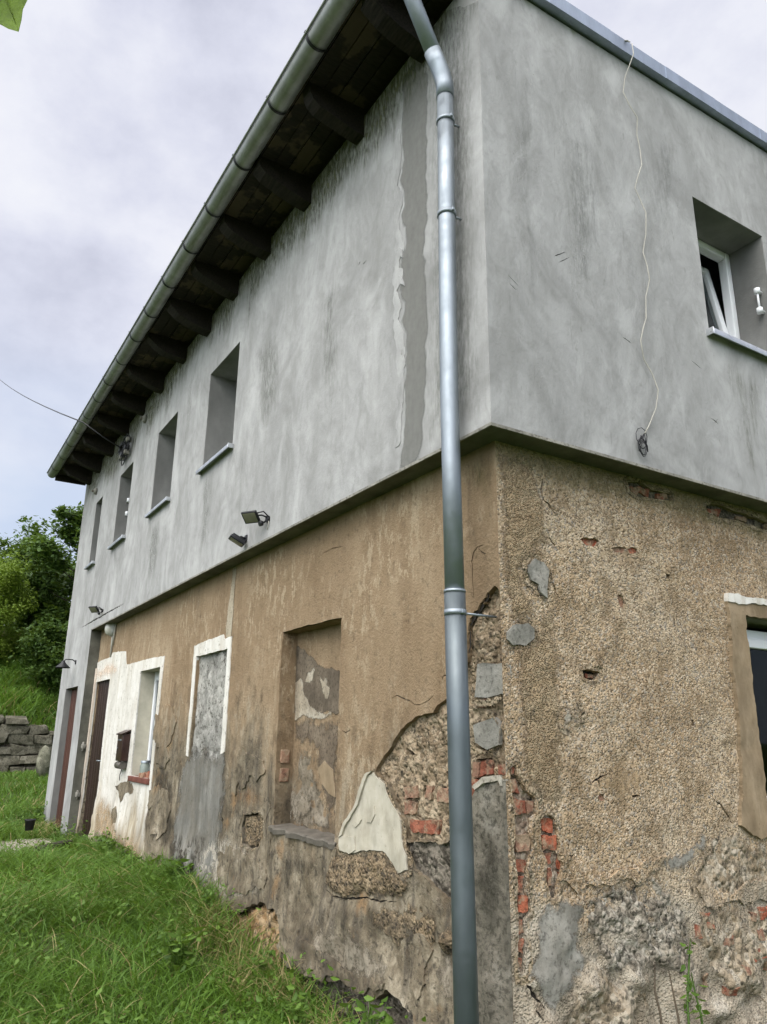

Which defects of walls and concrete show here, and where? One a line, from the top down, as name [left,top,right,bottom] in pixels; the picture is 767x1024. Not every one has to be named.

peeling [392,129,406,448]
spalling [624,476,674,503]
spalling [704,498,767,533]
flaking render [111,780,134,824]
flaking render [147,784,172,840]
water stain [153,815,230,886]
flaking render [217,810,267,897]
spalling [290,646,451,897]
spalling [468,589,568,986]
flaking render [276,903,453,1003]
spalling [566,829,767,1024]